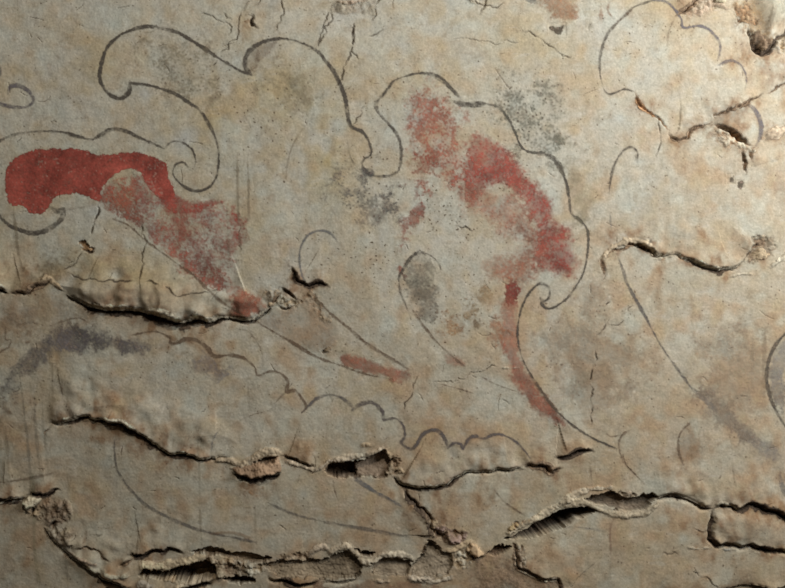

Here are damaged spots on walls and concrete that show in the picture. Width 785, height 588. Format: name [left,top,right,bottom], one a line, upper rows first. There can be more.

crack [738,20,785,56]
crack [636,95,760,171]
crack [0,273,279,332]
crack [44,414,219,462]
spalling [131,486,659,588]
crack [663,494,785,553]